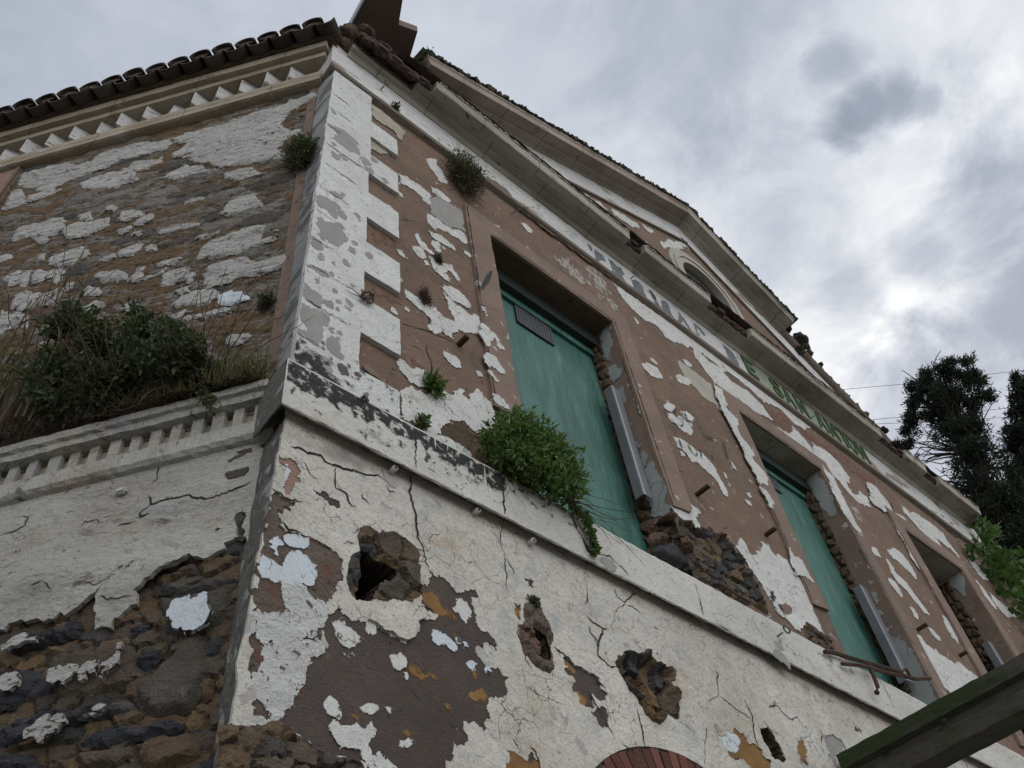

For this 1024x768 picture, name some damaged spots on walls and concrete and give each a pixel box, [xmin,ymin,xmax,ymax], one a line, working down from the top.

peeling [0,93,318,211]
peeling [0,205,286,335]
peeling [327,103,513,457]
water stain [286,332,537,508]
crack [81,432,429,567]
peeling [600,273,1018,705]
crack [76,578,135,600]
peeling [166,591,213,636]
peeling [215,453,508,768]
spalling [514,602,608,729]
crack [554,514,648,753]
spalling [615,649,682,725]